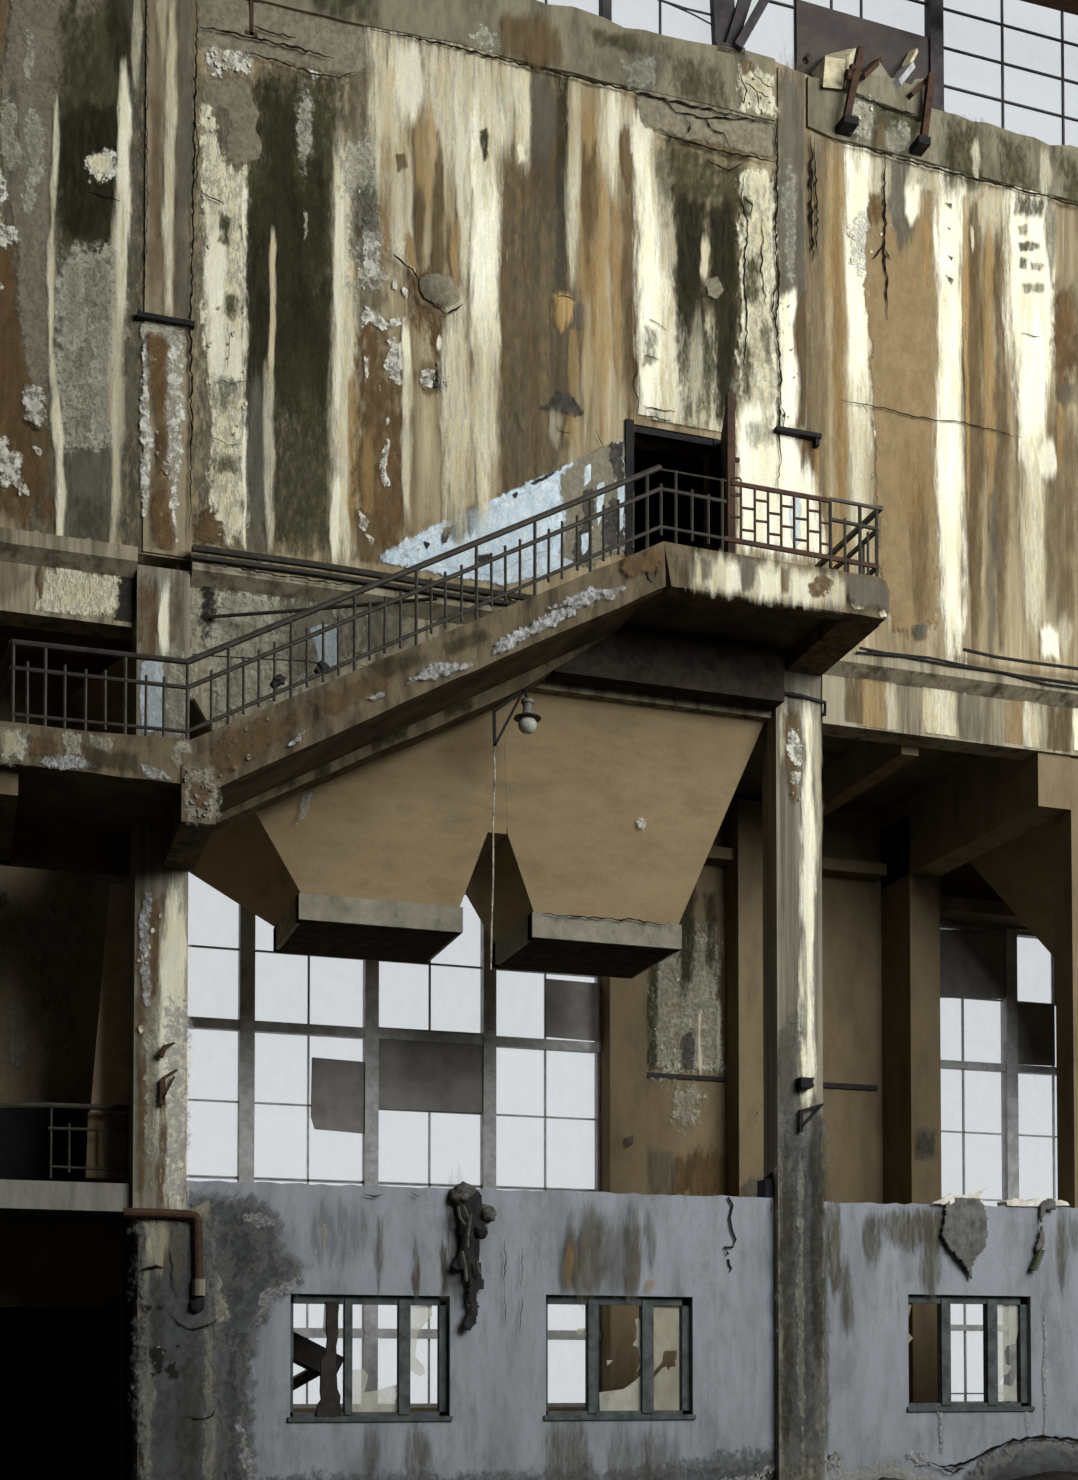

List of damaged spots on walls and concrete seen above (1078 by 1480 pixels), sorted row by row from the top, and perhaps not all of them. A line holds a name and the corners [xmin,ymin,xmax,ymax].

water stain [0,0,146,549]
peeling [0,0,253,549]
flaking render [379,418,390,487]
water stain [162,0,747,566]
peeling [358,440,626,586]
crack [370,29,1078,489]
rust [795,429,819,510]
rust [1037,281,1078,621]
rust [135,887,191,1207]
water stain [458,705,853,1480]
peeling [647,888,726,1132]
water stain [129,1190,439,1480]